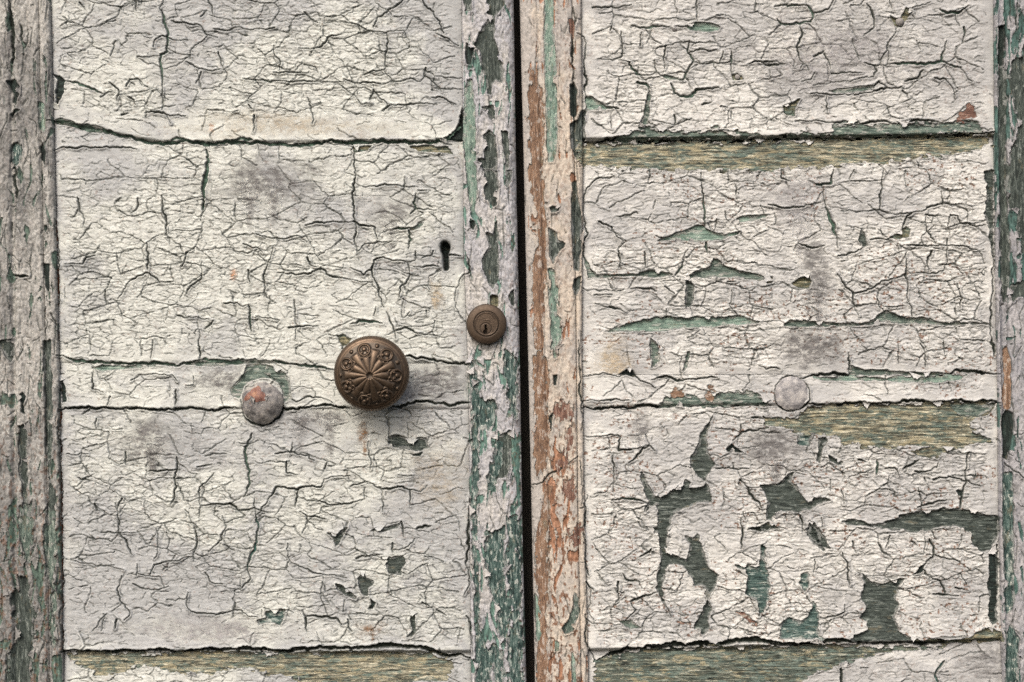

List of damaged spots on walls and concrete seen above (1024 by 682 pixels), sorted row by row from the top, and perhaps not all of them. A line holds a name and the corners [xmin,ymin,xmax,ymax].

crack [614,49,732,122]
crack [757,5,938,125]
crack [874,51,954,94]
crack [202,150,210,210]
rust [244,380,269,402]
peeling [527,0,1024,682]
peeling [17,393,31,523]
peeling [43,340,67,648]
crack [58,411,87,650]
crack [151,374,353,585]
peeling [465,349,524,682]
peeling [2,576,37,682]